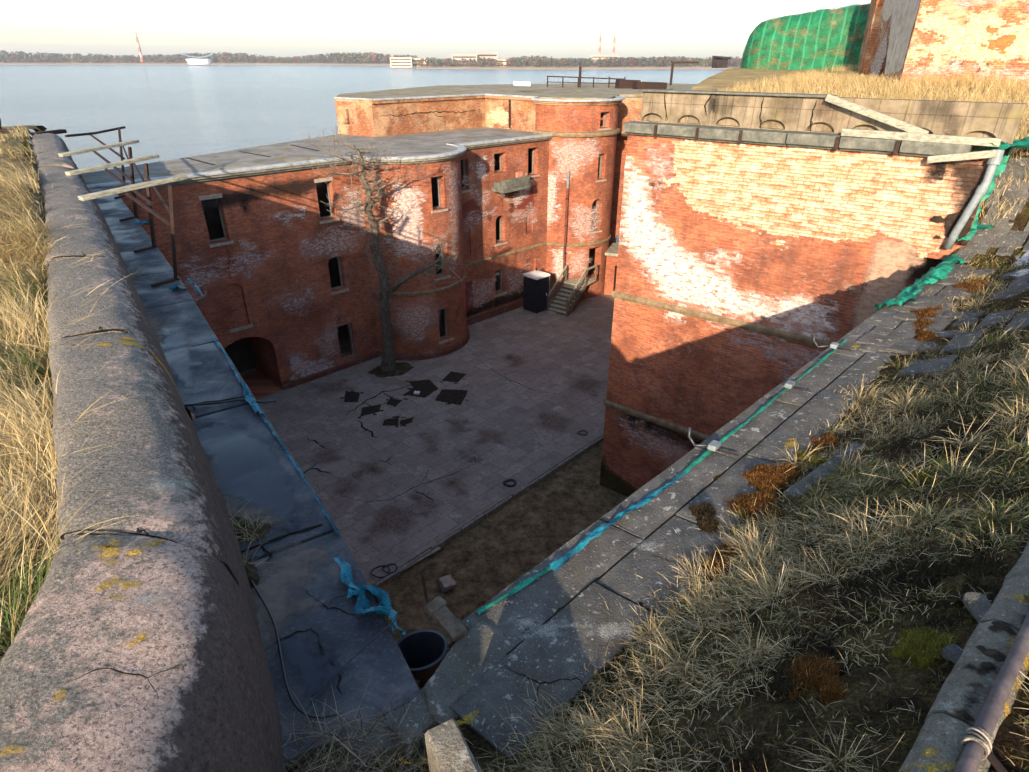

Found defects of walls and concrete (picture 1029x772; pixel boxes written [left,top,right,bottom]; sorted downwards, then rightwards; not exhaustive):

peeling [907,44,942,65]
spalling [980,25,1016,54]
leakage [203,177,321,210]
spalling [662,139,988,268]
leakage [926,161,986,221]
leakage [620,148,838,379]
crack [346,385,409,465]
crack [303,437,331,474]
crack [345,455,493,502]
crack [60,528,199,551]
crack [264,589,356,694]
crack [65,664,181,699]